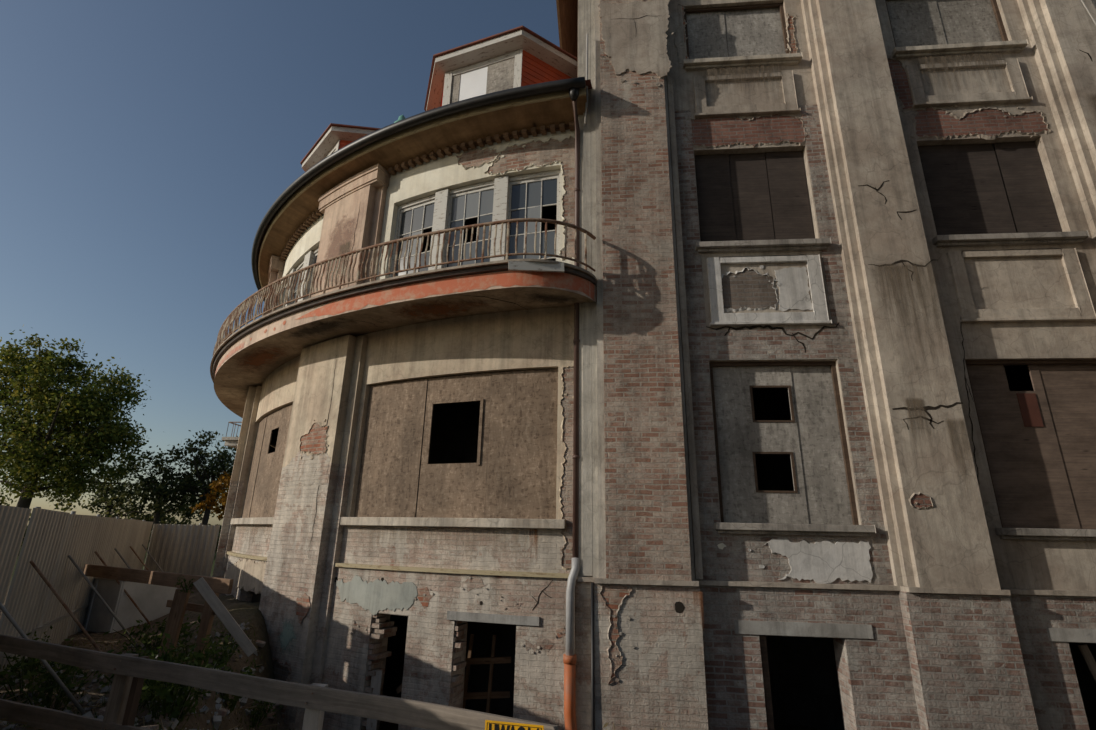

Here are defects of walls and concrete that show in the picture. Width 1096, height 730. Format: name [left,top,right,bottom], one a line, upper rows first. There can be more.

flaking render [598,0,674,87]
crack [858,180,915,220]
peeling [264,135,597,333]
flaking render [721,265,813,312]
crack [868,259,935,281]
crack [706,323,839,353]
crack [892,326,979,485]
flaking render [299,419,329,460]
flaking render [767,538,873,584]
flaking render [600,583,635,684]